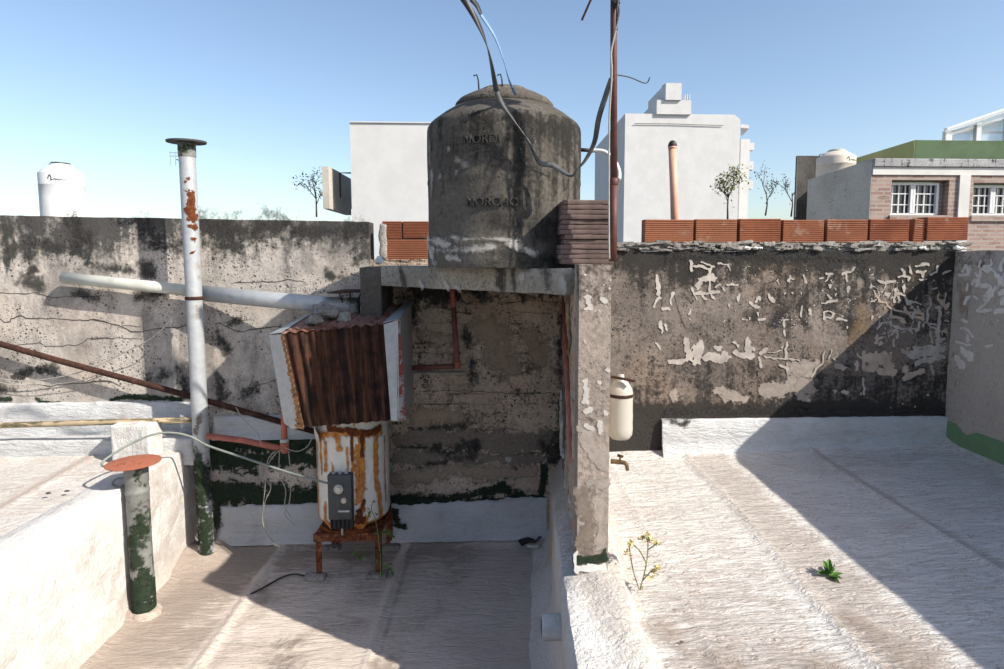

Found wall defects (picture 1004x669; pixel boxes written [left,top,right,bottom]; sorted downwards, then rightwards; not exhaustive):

rust [183,177,199,254]
water stain [0,214,181,292]
crack [0,292,185,347]
water stain [212,317,242,356]
crack [211,319,280,332]
water stain [399,209,572,387]
peeling [574,279,611,325]
peeling [653,274,675,350]
flaking render [668,257,1004,404]
water stain [0,363,62,393]
crack [27,380,123,390]
peeling [581,368,610,435]